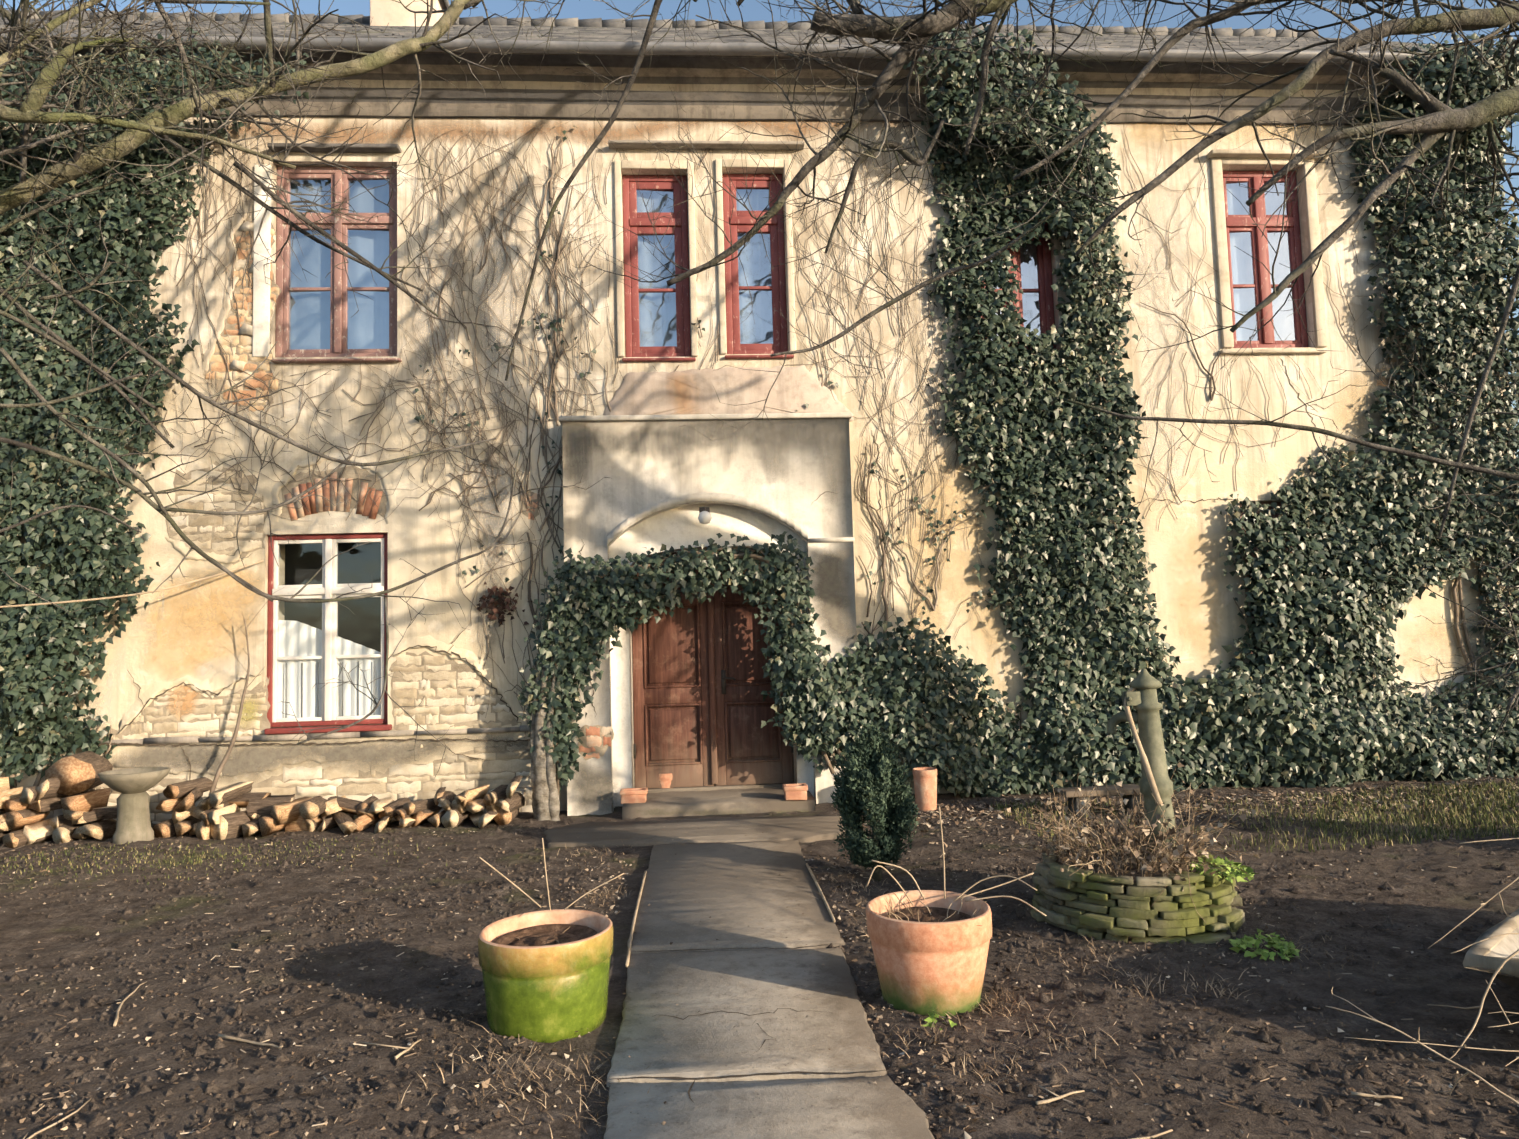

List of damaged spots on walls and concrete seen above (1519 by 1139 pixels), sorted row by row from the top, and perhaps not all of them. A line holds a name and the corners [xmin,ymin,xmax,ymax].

flaking render [201,209,281,412]
flaking render [165,452,397,565]
damp [153,573,253,667]
flaking render [87,665,271,745]
flaking render [146,635,533,824]
flaking render [87,783,121,823]